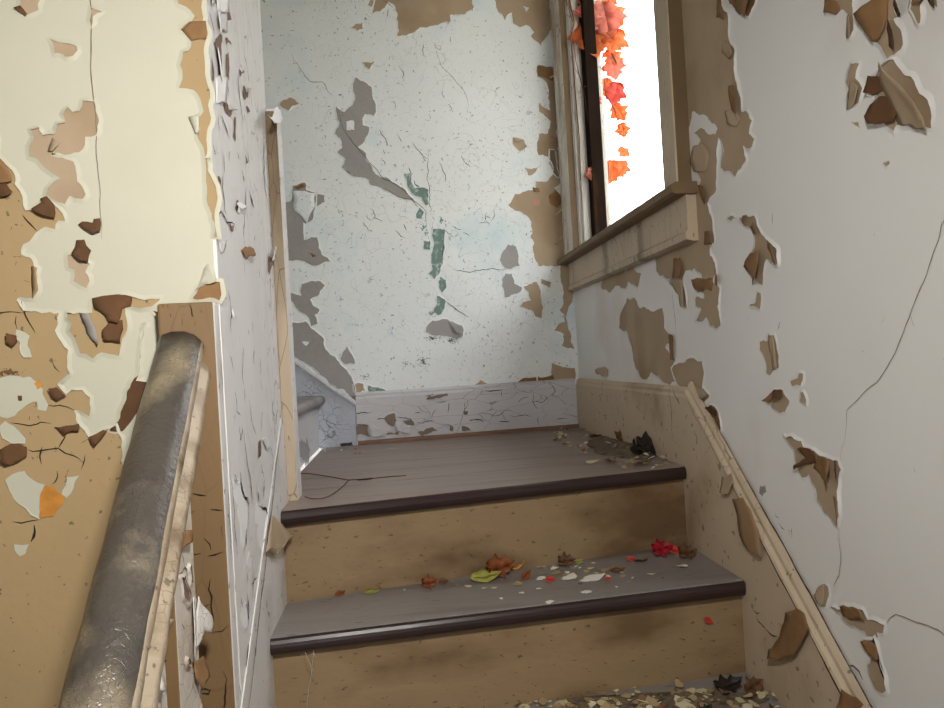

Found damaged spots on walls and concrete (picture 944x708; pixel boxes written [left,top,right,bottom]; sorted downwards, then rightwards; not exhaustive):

crack [0,256,35,332]
crack [13,520,36,542]
crack [14,405,90,484]
peeling [0,97,164,708]
crack [89,0,102,235]
peeling [174,0,254,240]
peeling [285,181,387,401]
peeling [498,64,576,350]
peeling [654,0,781,332]
peeling [823,0,942,139]
crack [845,221,944,433]
crack [886,614,944,635]